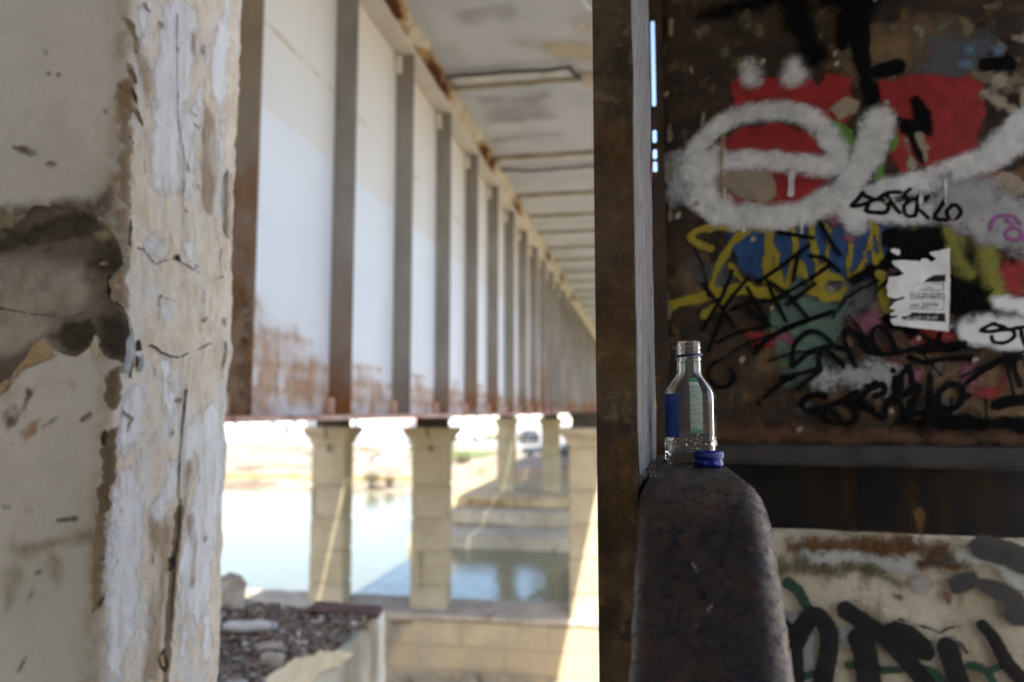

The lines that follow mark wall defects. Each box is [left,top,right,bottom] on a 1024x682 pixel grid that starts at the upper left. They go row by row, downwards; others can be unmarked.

corrosion [385,0,452,101]
leakage [50,190,110,219]
corrosion [477,140,496,175]
spalling [0,0,233,682]
corrosion [252,335,327,415]
crack [114,301,227,638]